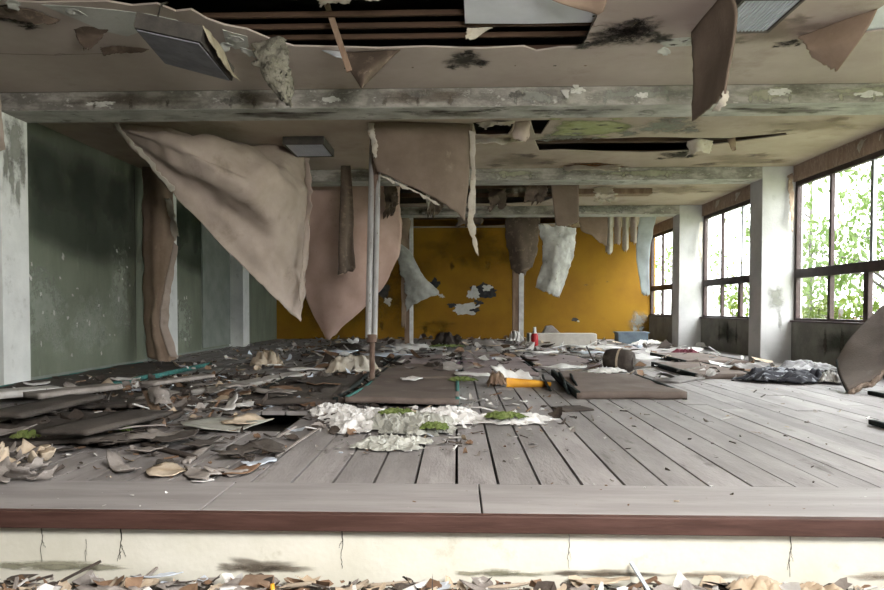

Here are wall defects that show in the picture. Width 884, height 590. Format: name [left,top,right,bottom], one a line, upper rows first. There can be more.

damp [0,18,36,30]
peeling [41,4,177,36]
peeling [220,29,256,58]
damp [576,17,687,49]
damp [448,50,486,69]
damp [93,95,168,107]
damp [229,93,336,119]
damp [383,91,481,116]
damp [515,88,696,141]
damp [732,86,884,113]
peeling [378,285,392,307]
peeling [430,277,497,315]